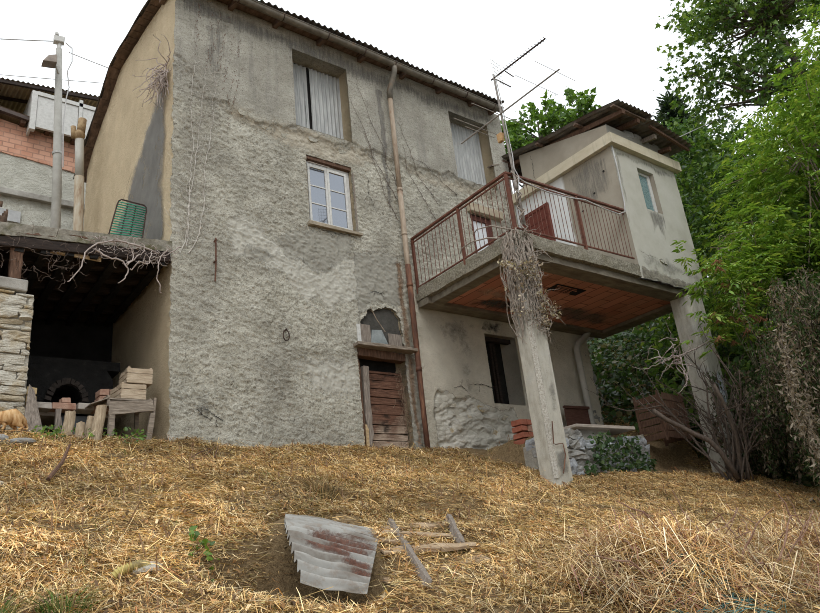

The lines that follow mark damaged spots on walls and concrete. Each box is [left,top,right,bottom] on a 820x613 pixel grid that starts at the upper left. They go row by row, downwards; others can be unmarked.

spalling [227,108,373,167]